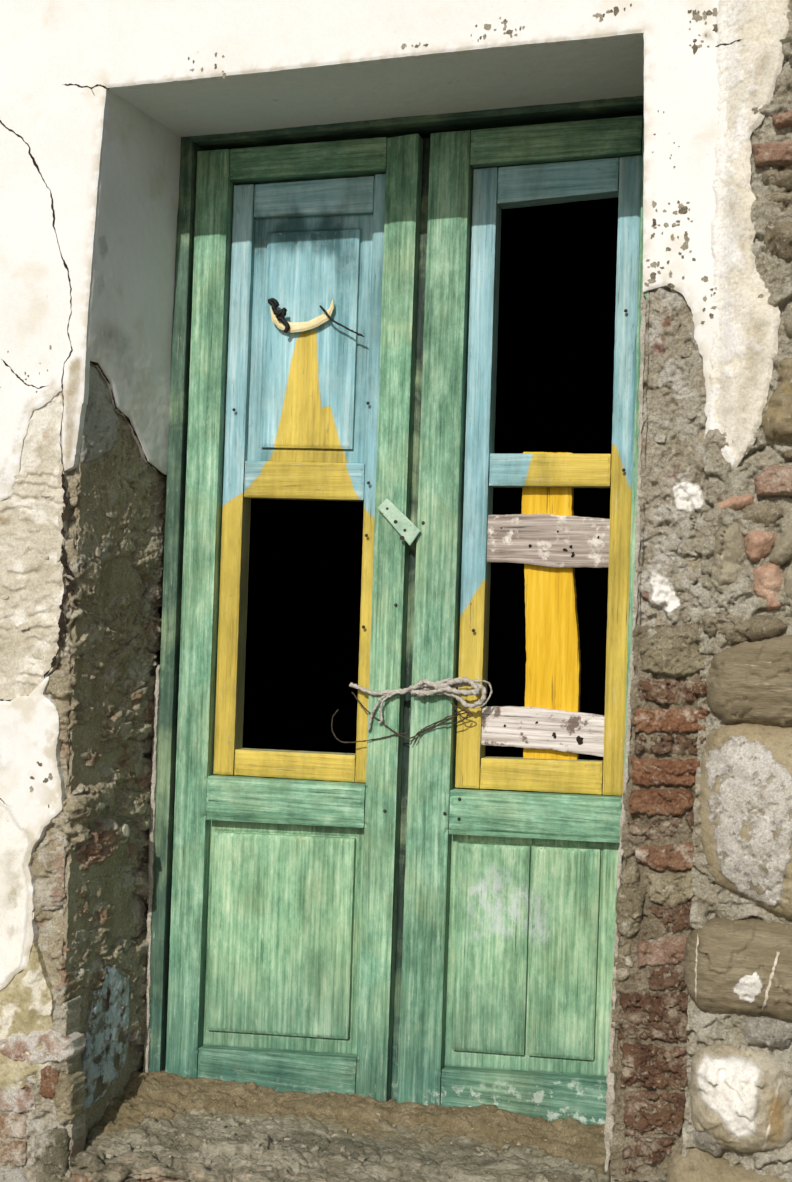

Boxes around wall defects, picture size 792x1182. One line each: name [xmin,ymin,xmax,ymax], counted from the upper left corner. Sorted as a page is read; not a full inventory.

crack [0,120,167,679]
crack [64,83,110,96]
flaking render [634,0,790,638]
spalling [0,363,167,1182]